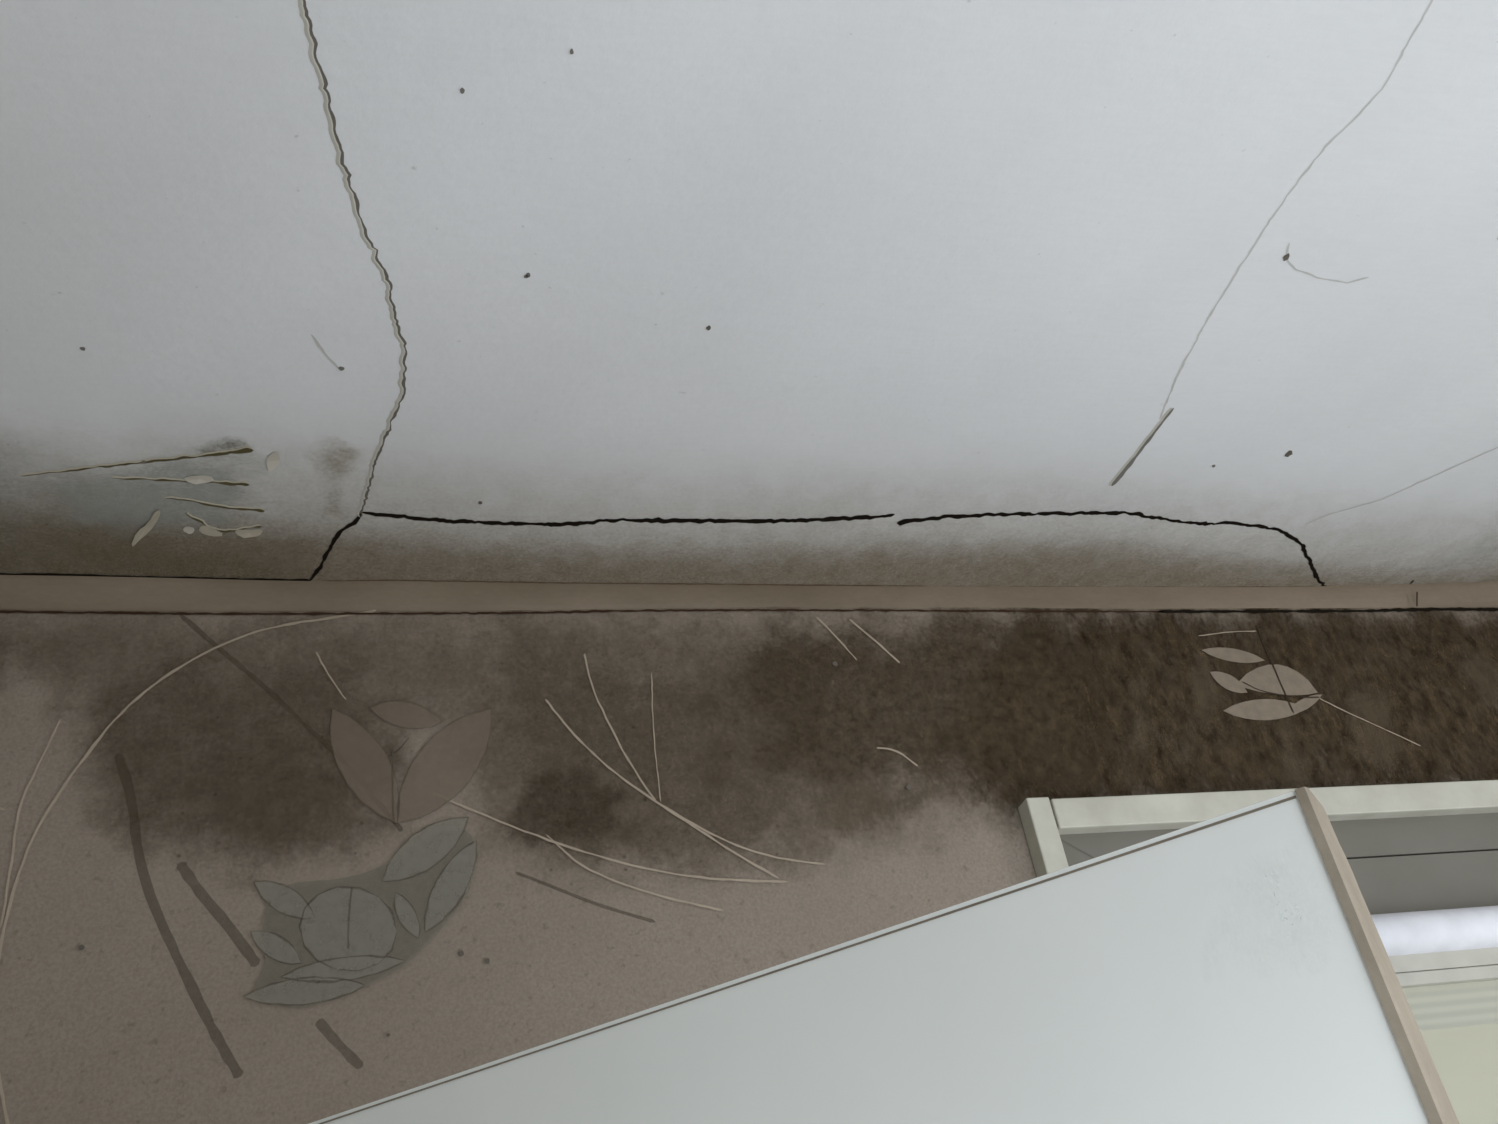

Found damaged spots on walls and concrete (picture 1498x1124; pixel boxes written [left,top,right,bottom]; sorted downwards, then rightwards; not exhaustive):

crack [0,0,1498,615]
leakage [749,608,1498,824]